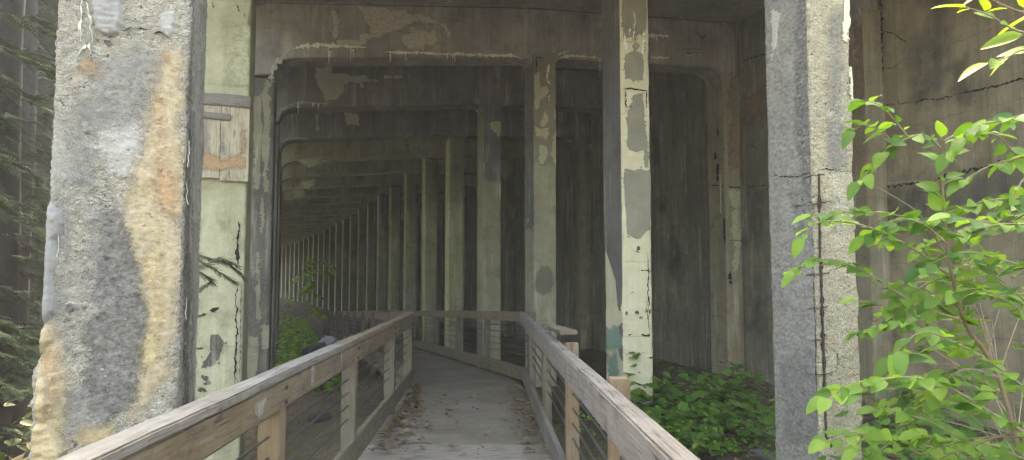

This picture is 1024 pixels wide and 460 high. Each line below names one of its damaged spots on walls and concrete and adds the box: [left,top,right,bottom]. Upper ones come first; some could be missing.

damp [75,0,93,60]
rust [122,47,185,414]
crack [198,222,242,381]
peeling [524,52,556,233]
peeling [602,0,659,361]
crack [879,0,1023,105]